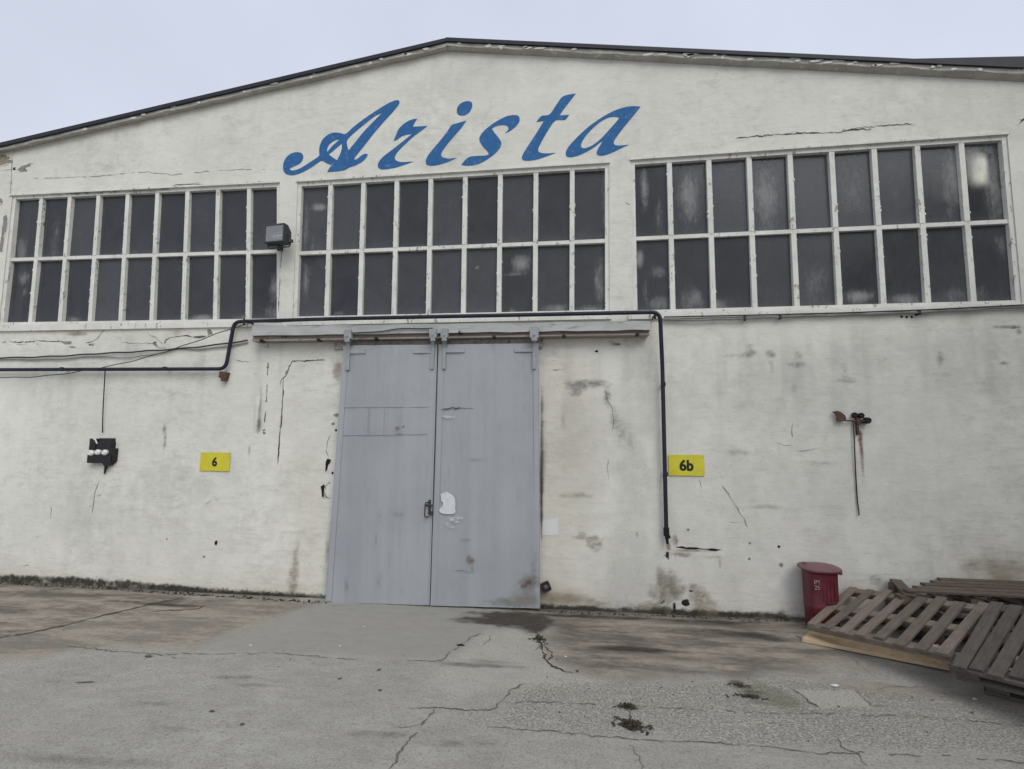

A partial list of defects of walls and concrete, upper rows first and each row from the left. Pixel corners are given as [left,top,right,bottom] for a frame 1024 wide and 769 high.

crack [738,123,912,138]
crack [237,345,323,460]
crack [0,598,356,660]
crack [408,633,491,662]
crack [535,632,574,673]
damp [503,577,786,641]
crack [389,683,950,769]
crack [857,686,1024,726]